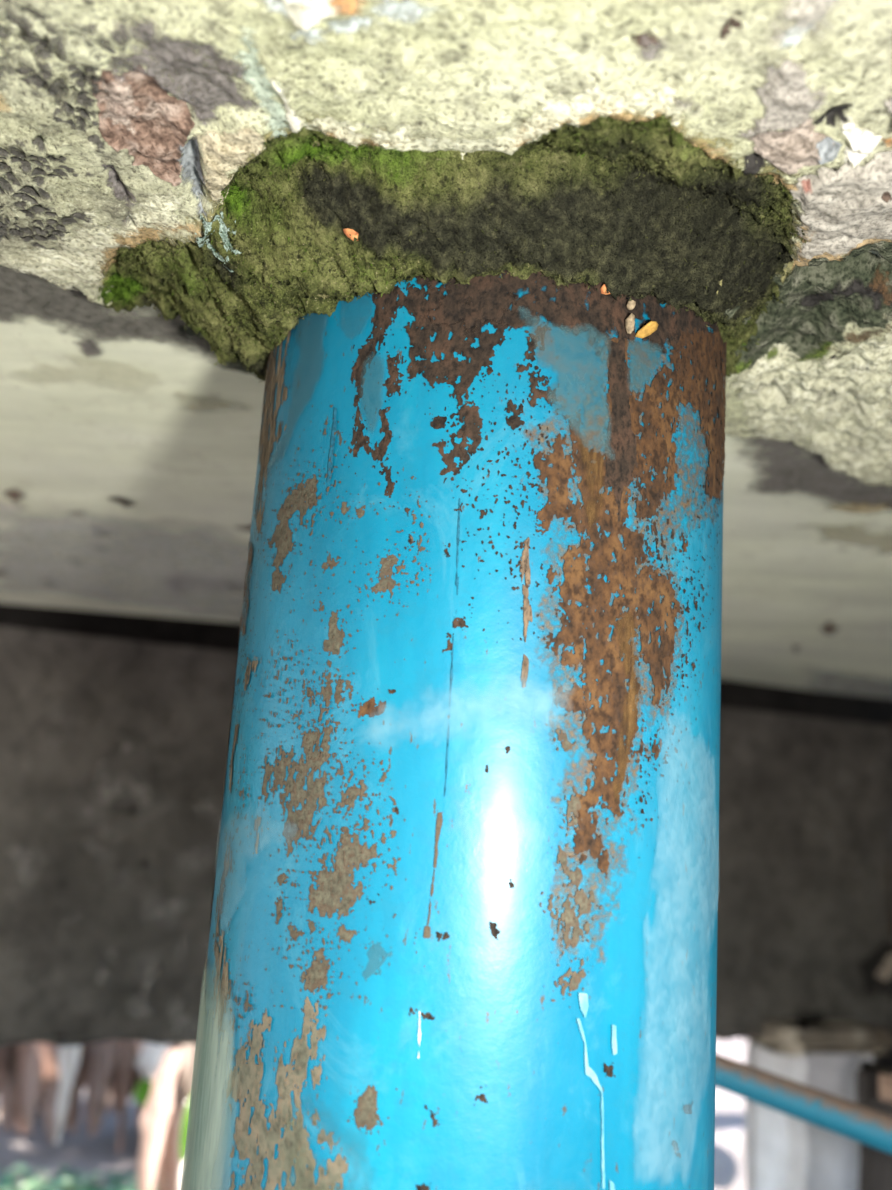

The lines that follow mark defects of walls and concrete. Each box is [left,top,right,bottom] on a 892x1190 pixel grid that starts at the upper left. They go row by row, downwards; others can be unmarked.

water stain [0,0,287,136]
spalling [282,0,341,31]
water stain [640,38,667,61]
peeling [0,64,264,357]
water stain [178,137,242,272]
peeling [741,60,892,261]
peeling [424,373,567,610]
peeling [442,597,474,654]
corrosion [393,270,727,1008]
peeling [203,284,440,1190]
peeling [490,922,500,940]